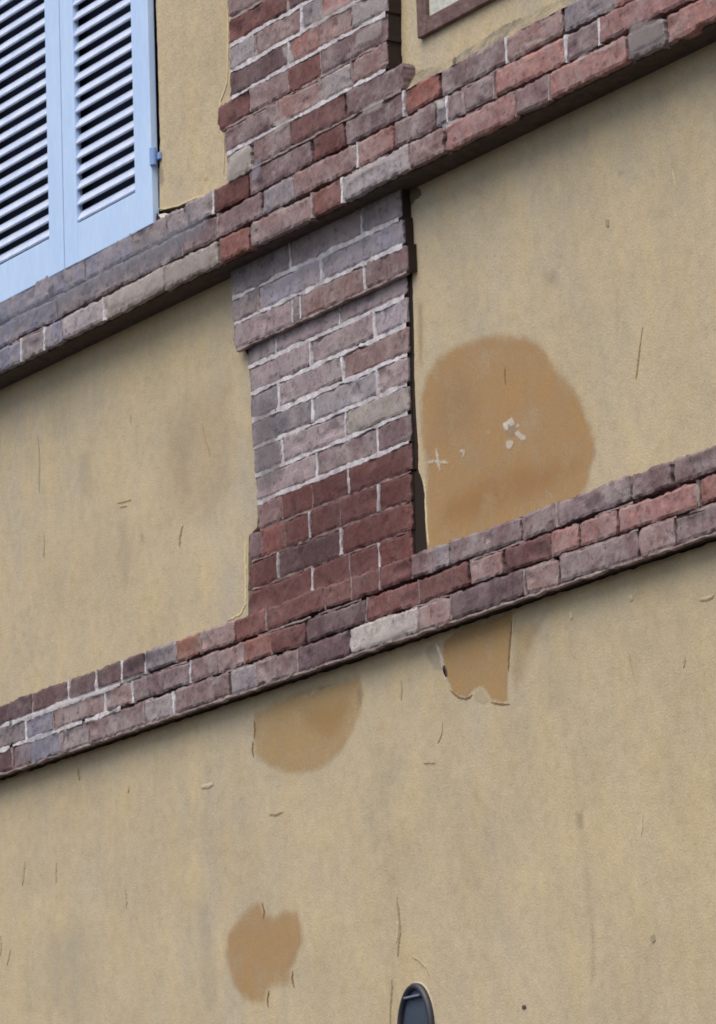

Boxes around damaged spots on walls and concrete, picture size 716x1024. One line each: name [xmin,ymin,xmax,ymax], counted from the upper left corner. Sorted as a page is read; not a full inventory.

leakage [423,340,592,547]
peeling [436,614,511,705]
leakage [229,906,300,999]